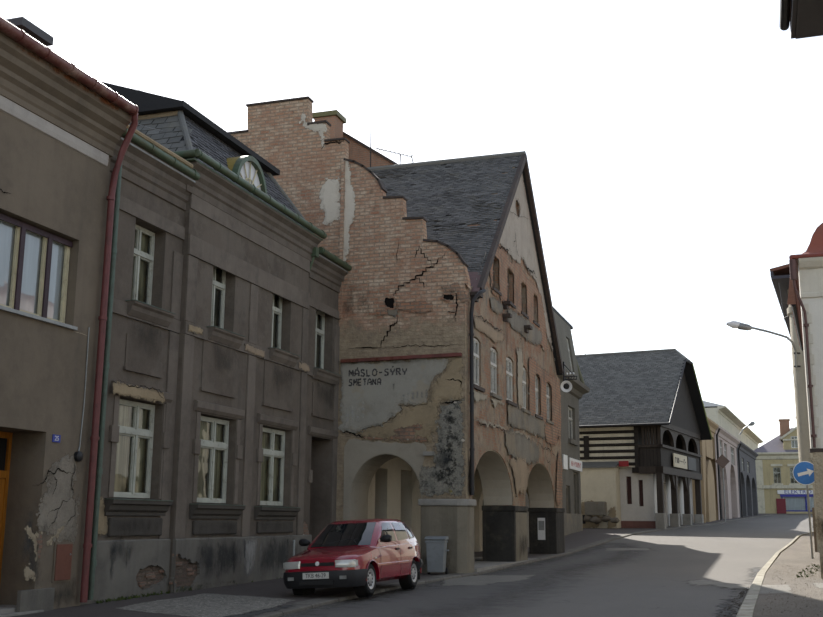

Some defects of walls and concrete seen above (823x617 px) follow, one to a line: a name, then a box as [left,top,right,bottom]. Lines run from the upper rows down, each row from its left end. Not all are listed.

flaking render [319,160,356,261]
crack [393,244,445,296]
crack [349,317,451,349]
flaking render [482,174,561,439]
flaking render [24,453,80,581]
crack [39,467,76,524]
flaking render [113,381,165,403]
crack [341,369,462,439]
flaking render [338,357,476,497]
water stain [436,411,458,485]
crack [474,419,557,465]
flaking render [508,456,529,497]